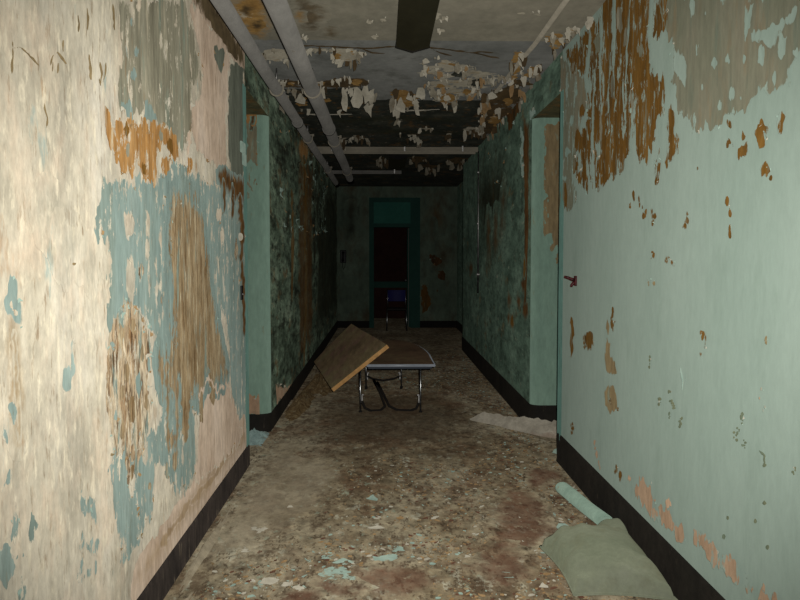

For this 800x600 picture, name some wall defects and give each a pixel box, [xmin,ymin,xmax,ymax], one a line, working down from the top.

peeling [278,79,328,236]
damp [293,105,330,146]
peeling [301,34,377,118]
damp [327,99,514,281]
peeling [389,50,543,178]
peeling [543,0,800,264]
peeling [94,0,260,567]
damp [152,174,230,473]
peeling [570,317,594,358]
peeling [604,307,617,375]
peeling [258,577,306,591]
spalling [614,464,777,600]